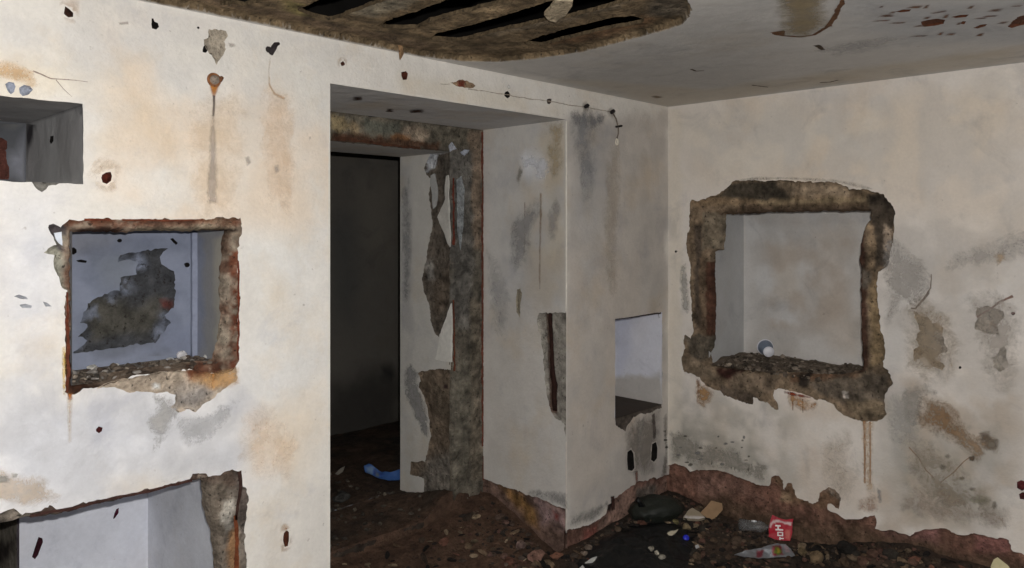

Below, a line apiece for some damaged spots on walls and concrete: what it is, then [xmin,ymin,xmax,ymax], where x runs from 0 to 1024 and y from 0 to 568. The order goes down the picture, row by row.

flaking render [197,27,228,65]
peeling [544,0,573,22]
peeling [430,173,465,250]
spalling [44,217,242,413]
peeling [435,303,453,362]
spalling [537,312,566,435]
spalling [675,180,895,422]
flaking render [975,295,1013,372]
spalling [0,469,249,568]
flaking render [483,450,1024,568]
rust [862,421,881,510]